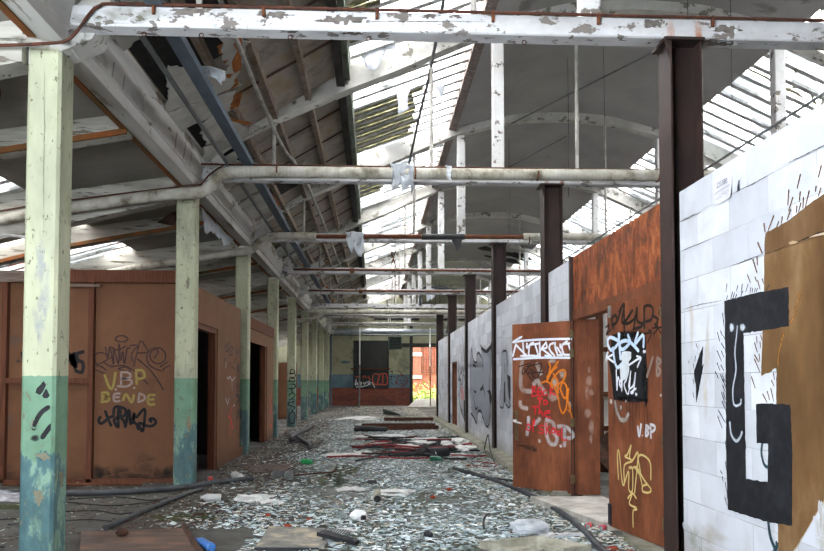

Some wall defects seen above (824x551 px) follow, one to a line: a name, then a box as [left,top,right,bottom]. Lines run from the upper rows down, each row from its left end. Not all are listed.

peeling [170,8,214,18]
peeling [257,9,294,20]
peeling [420,13,464,21]
peeling [315,12,370,36]
peeling [637,19,668,29]
peeling [702,23,743,46]